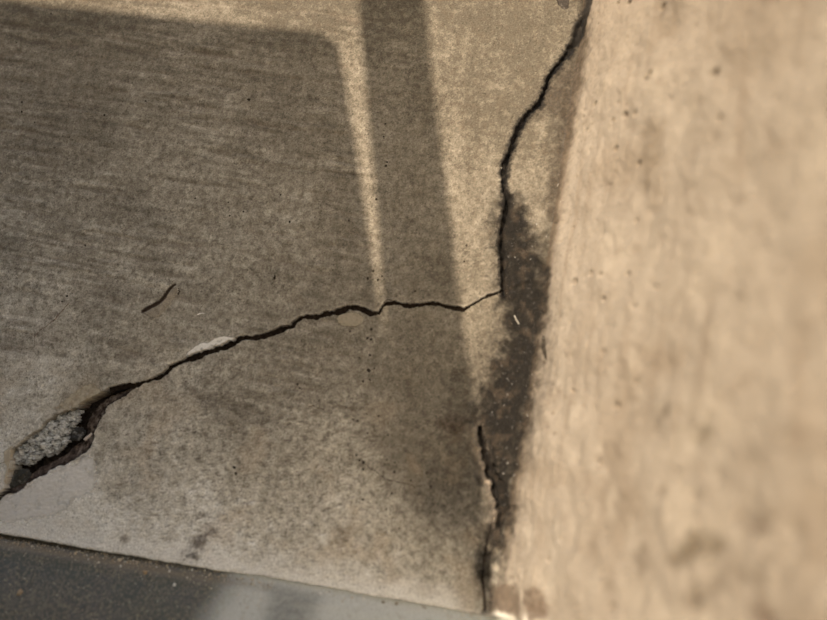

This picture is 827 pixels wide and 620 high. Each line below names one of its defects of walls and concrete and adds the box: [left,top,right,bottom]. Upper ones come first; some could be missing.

crack [110,0,592,393]
spalling [9,384,136,494]
leakage [472,194,551,617]